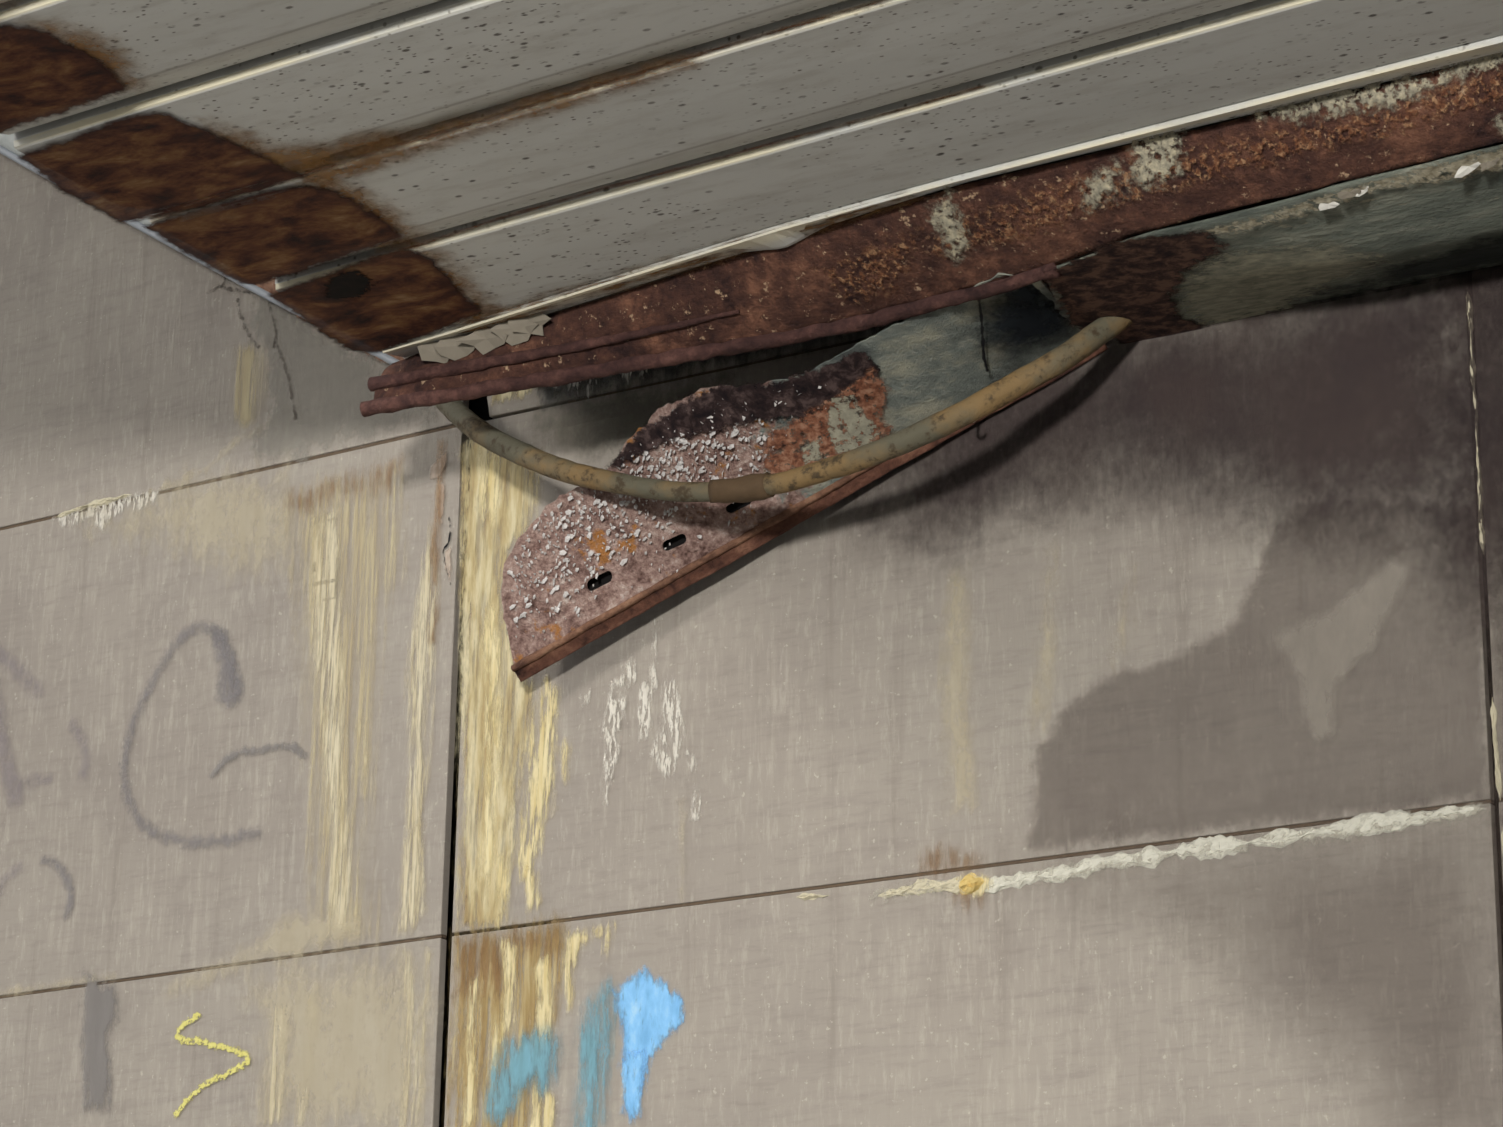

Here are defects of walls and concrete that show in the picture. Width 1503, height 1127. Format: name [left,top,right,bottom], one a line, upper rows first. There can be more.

corrosion [0,0,984,361]
corrosion [1043,229,1229,344]
corrosion [823,74,1503,303]
corrosion [608,351,893,474]
water stain [852,237,1503,573]
water stain [796,893,829,901]
water stain [877,697,1502,899]